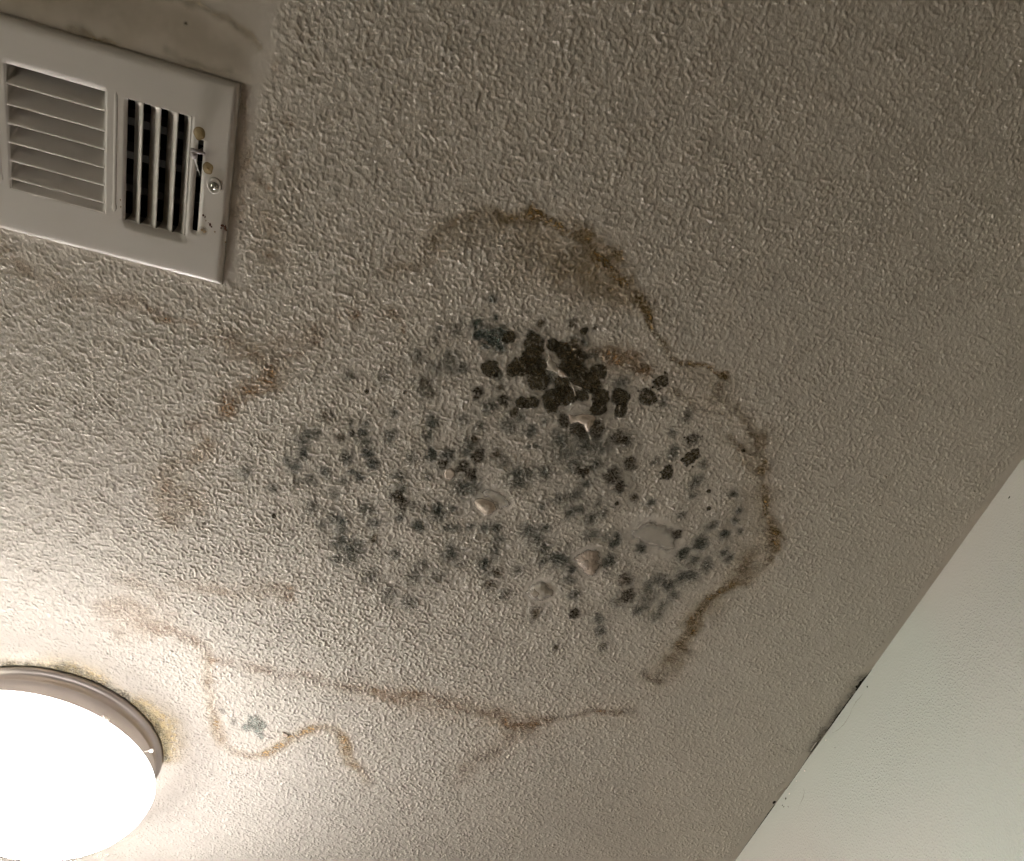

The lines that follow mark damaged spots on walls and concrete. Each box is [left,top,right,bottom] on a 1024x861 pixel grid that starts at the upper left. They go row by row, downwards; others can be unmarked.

damp [565,229,726,379]
damp [473,315,668,455]
damp [338,424,378,480]
damp [391,473,407,519]
damp [426,421,505,493]
damp [559,457,637,505]
damp [653,431,705,484]
damp [619,573,639,612]
damp [234,716,266,739]